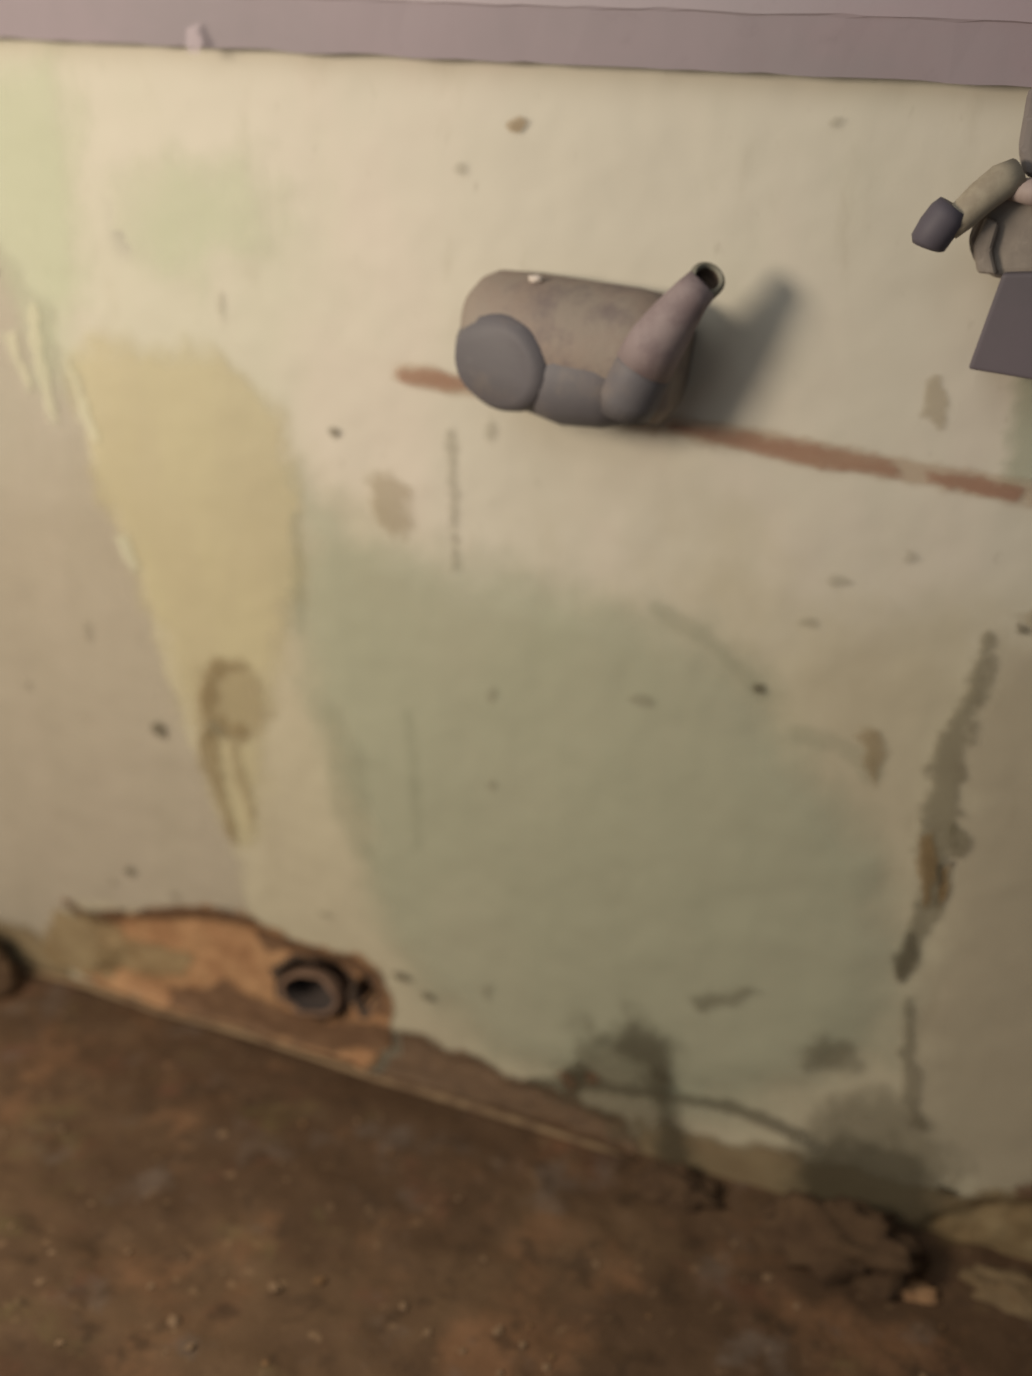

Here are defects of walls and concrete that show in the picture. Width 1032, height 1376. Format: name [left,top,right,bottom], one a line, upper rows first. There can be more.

spalling [43,901,638,1153]
spalling [898,1185,1032,1262]